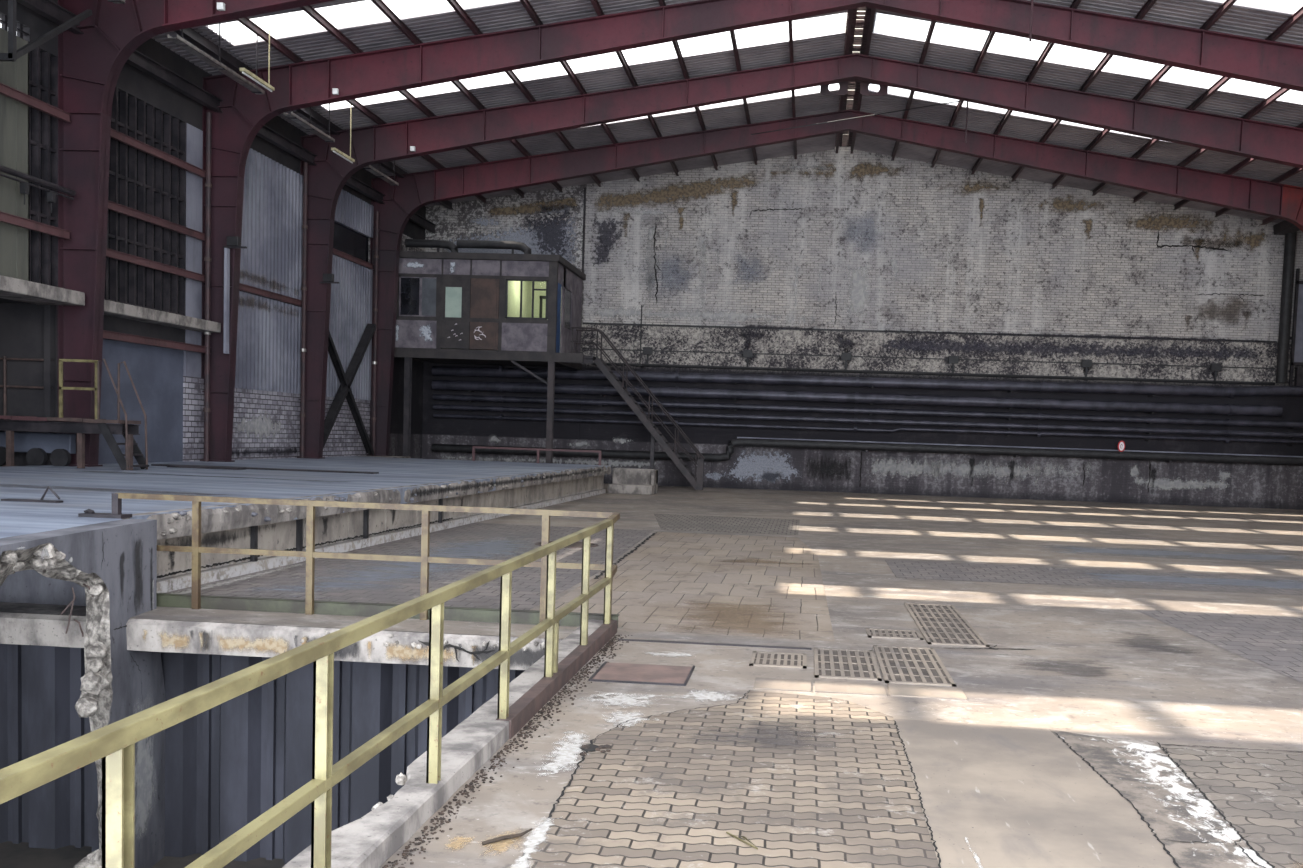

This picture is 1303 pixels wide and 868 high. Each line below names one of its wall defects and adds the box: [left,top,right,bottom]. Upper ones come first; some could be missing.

spalling [0,758,102,868]
spalling [0,543,113,769]
spalling [161,652,272,701]
spalling [165,662,313,864]
spalling [332,640,525,831]